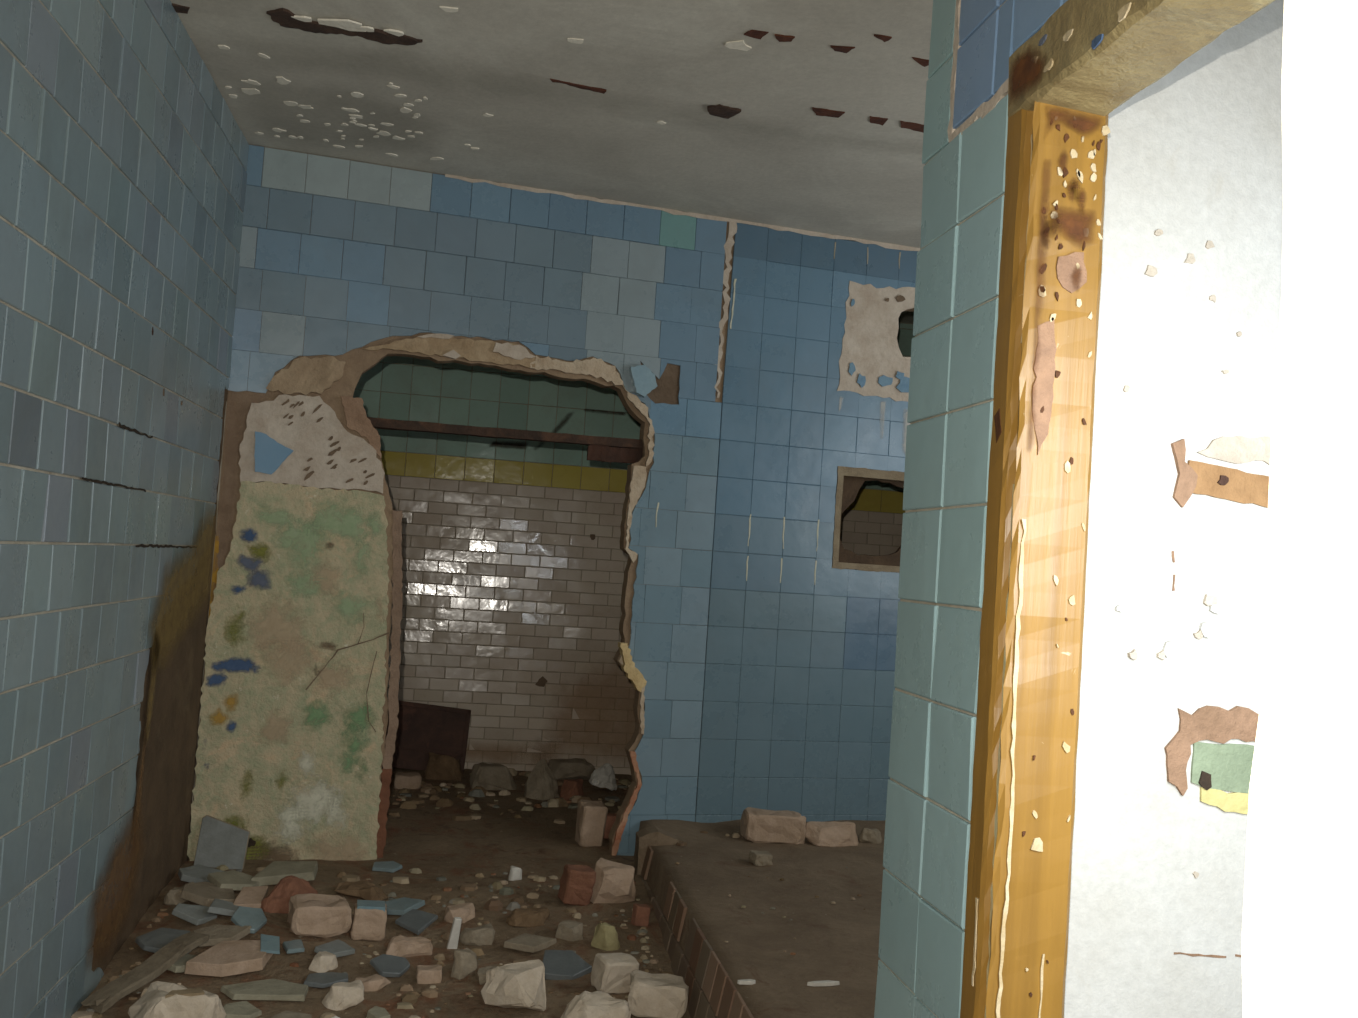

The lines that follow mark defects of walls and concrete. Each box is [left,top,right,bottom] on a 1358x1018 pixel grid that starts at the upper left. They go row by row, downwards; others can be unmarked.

spalling [266,8,423,46]
peeling [724,30,795,51]
spalling [830,45,855,53]
peeling [254,82,428,157]
spalling [707,104,741,119]
spalling [812,107,845,118]
spalling [869,116,924,133]
spalling [837,281,915,402]
spalling [364,333,680,563]
flaking render [1171,436,1271,508]
spalling [618,642,647,734]
flaking render [1164,705,1259,814]